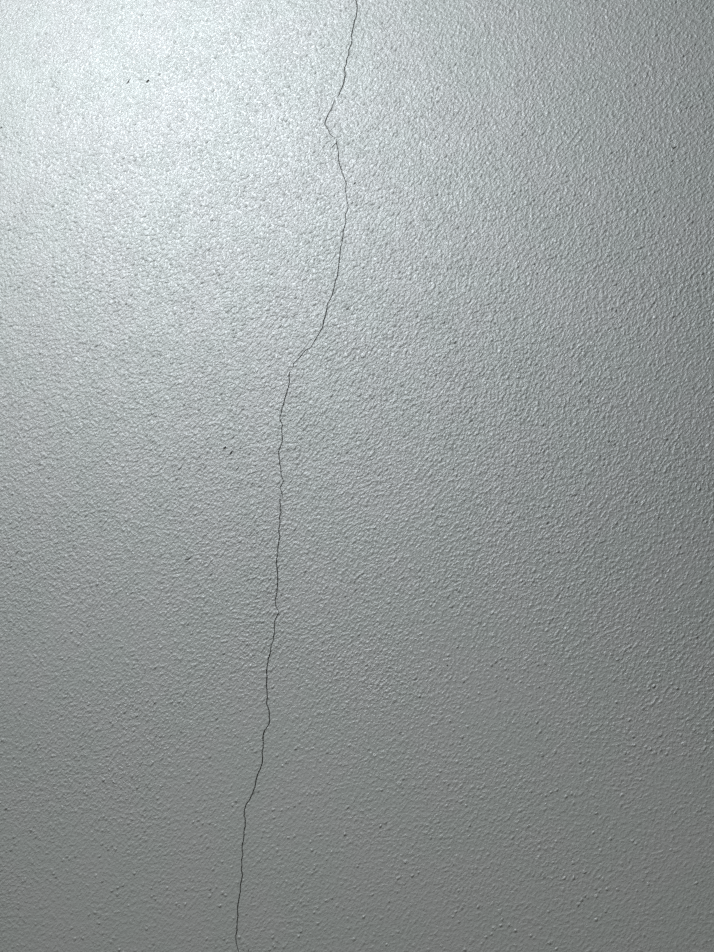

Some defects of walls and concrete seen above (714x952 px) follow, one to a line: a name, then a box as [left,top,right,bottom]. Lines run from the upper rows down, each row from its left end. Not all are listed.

crack [235,0,358,952]